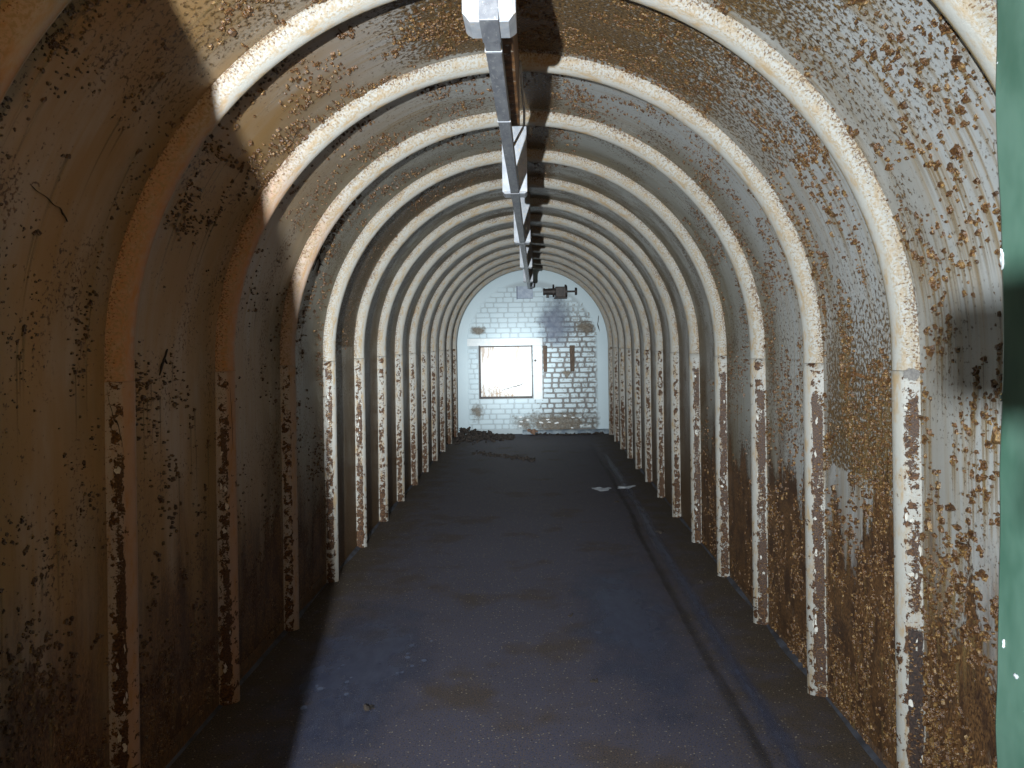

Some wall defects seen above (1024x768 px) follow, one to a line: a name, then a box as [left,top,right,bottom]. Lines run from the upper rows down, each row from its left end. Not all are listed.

rust [0,0,326,268]
rust [0,211,42,408]
rust [67,285,99,398]
peeling [113,453,128,768]
peeling [325,395,334,534]
peeling [719,370,729,565]
peeling [756,388,768,609]
peeling [811,391,827,688]
rust [710,0,1003,768]
peeling [904,394,920,489]
peeling [905,512,922,615]
peeling [908,626,926,768]